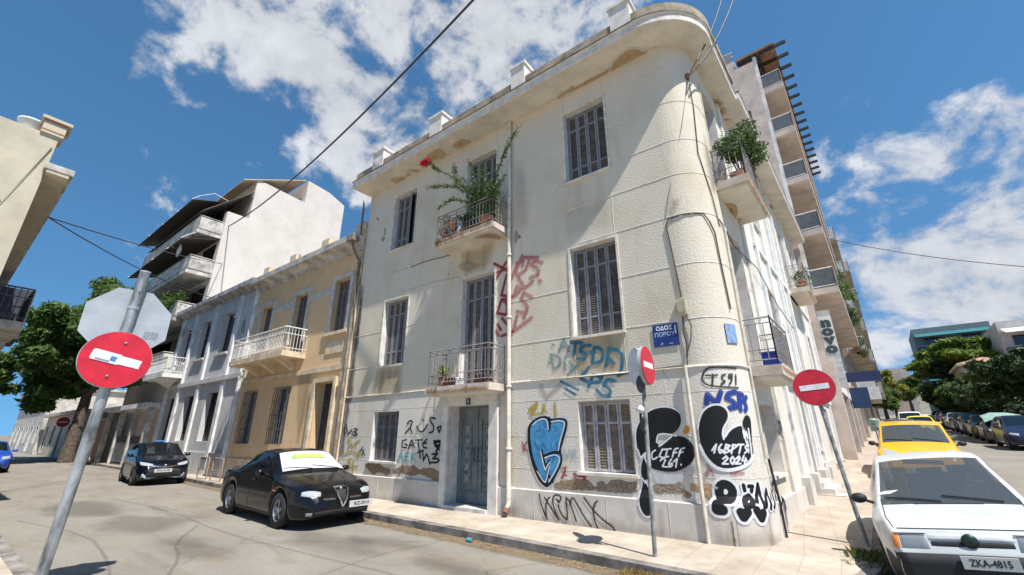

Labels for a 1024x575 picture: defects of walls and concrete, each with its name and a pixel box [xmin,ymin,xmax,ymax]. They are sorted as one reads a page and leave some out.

flaking render [365,463,439,481]
flaking render [554,479,638,494]